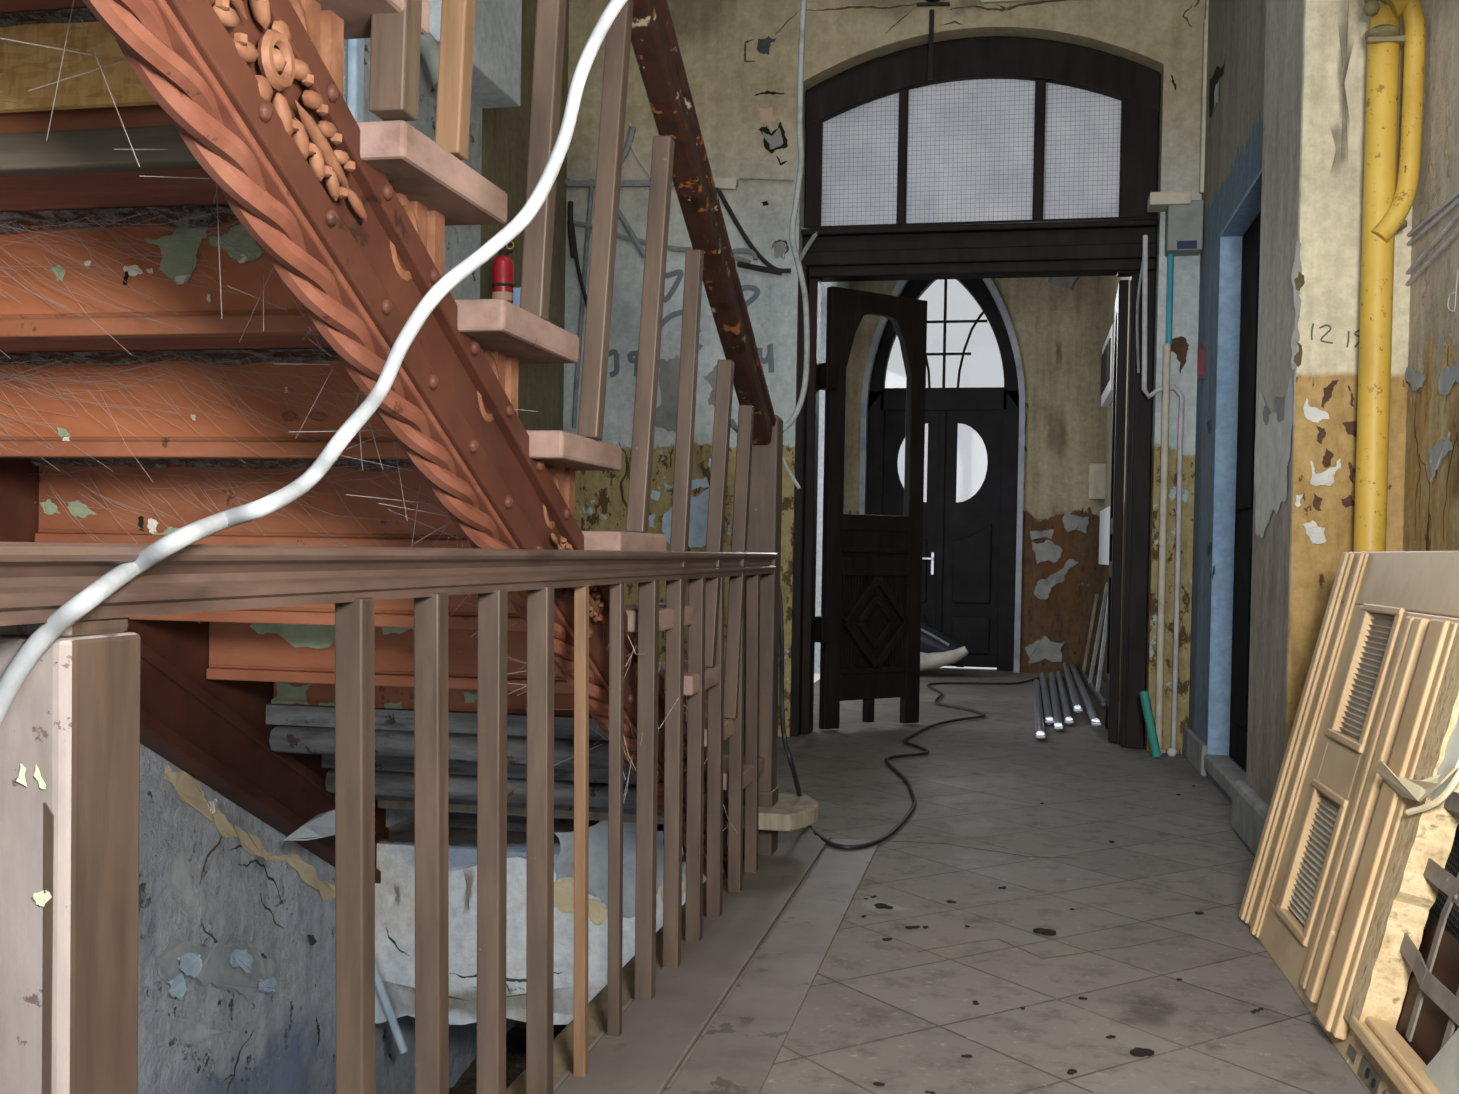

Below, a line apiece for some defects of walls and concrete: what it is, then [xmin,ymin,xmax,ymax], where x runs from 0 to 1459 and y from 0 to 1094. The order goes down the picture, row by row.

crack [775,0,1067,35]
spalling [754,91,788,165]
peeling [123,224,261,285]
peeling [1254,240,1357,544]
peeling [1405,363,1459,398]
peeling [1430,432,1453,483]
peeling [648,490,672,544]
peeling [688,458,711,548]
peeling [1030,514,1089,600]
peeling [1025,636,1065,664]
spalling [164,765,335,901]